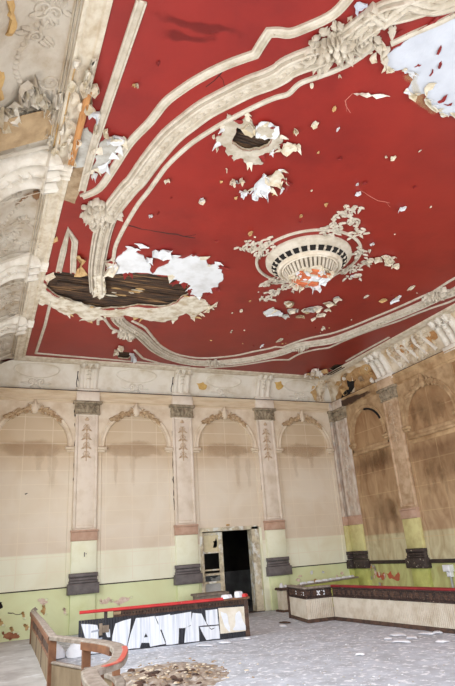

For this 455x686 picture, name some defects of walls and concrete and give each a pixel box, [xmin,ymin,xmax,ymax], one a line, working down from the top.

peeling [347,2,368,22]
peeling [369,15,455,118]
spalling [0,58,128,204]
spalling [212,113,302,172]
peeling [220,168,292,202]
spalling [37,243,229,324]
spalling [288,265,335,294]
spalling [263,296,342,333]
spalling [304,364,381,400]
spalling [0,612,30,640]